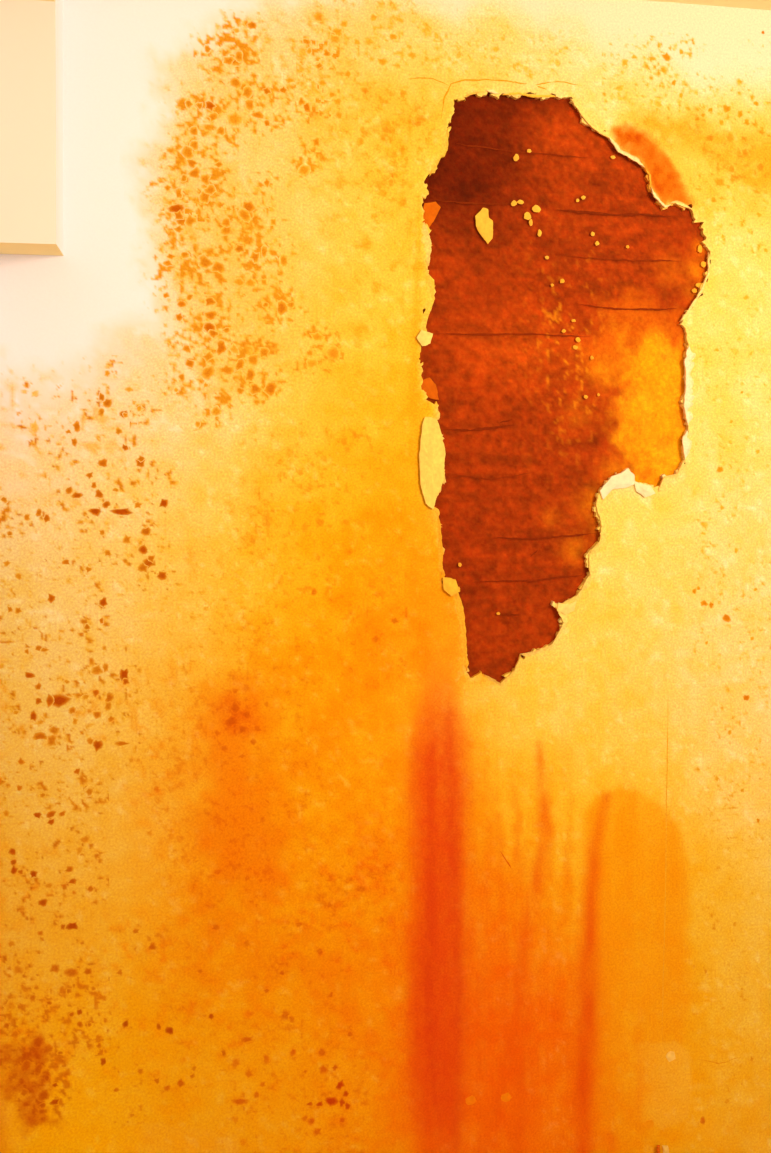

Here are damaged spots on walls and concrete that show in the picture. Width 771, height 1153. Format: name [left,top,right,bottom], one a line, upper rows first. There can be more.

spalling [403,74,722,700]
corrosion [617,120,689,192]
corrosion [390,652,485,1153]
corrosion [564,788,614,1153]